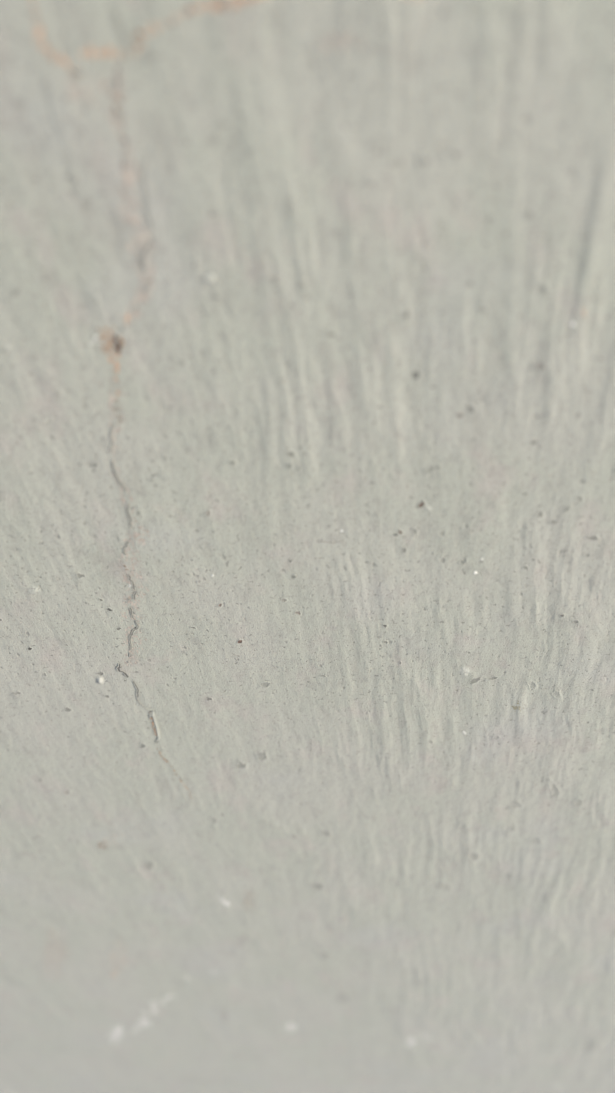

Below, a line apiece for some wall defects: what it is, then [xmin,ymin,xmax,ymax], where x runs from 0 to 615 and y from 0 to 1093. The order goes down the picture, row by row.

crack [106,57,164,330]
crack [108,376,192,805]